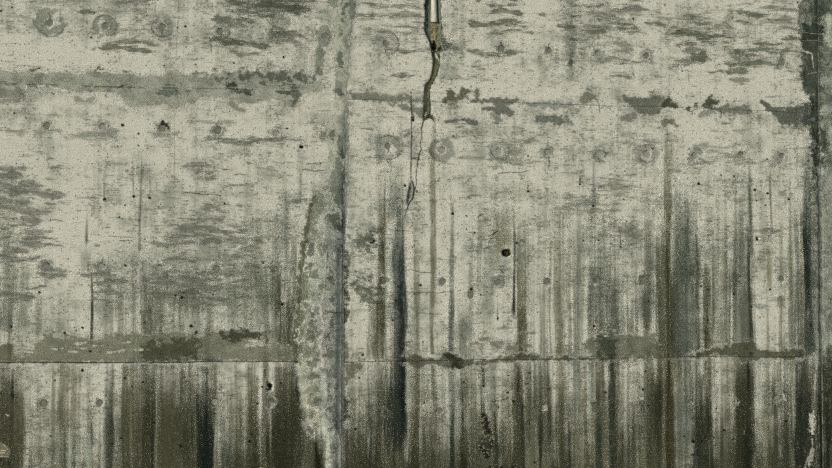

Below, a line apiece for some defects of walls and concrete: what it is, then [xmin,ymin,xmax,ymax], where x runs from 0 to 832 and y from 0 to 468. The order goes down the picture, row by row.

damp [801,0,829,190]
damp [0,328,294,365]
damp [342,335,363,385]
damp [403,330,664,372]
damp [689,342,804,380]
damp [799,410,817,468]